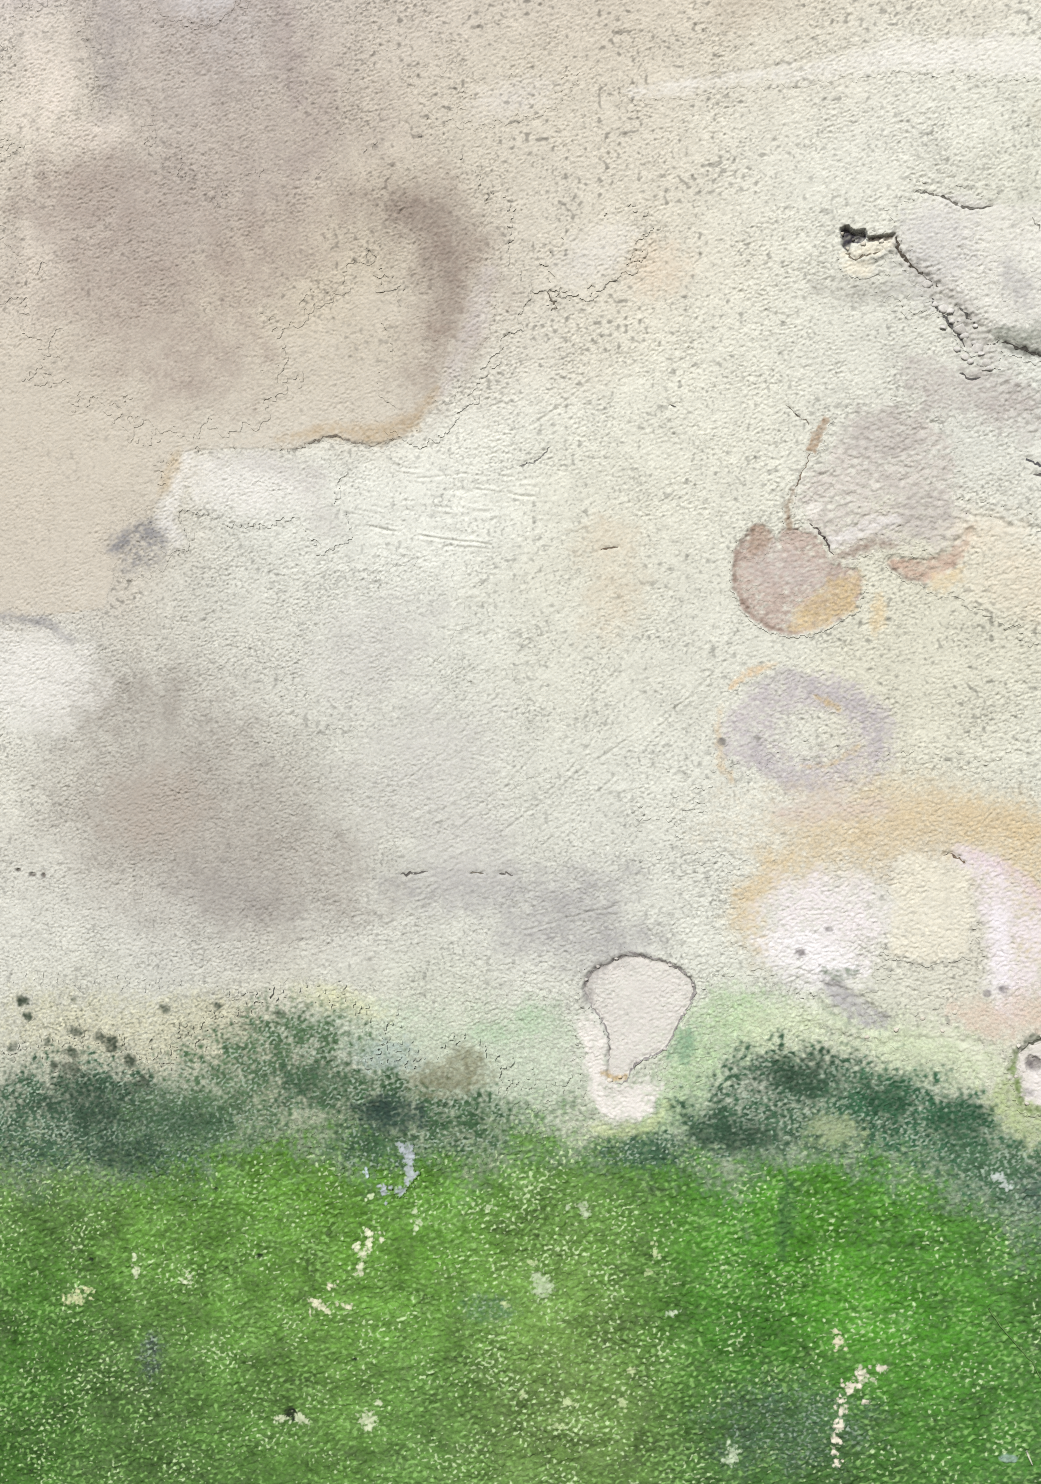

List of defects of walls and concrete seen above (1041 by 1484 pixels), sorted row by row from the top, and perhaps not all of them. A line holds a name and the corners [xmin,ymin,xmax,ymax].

flaking render [782,389,979,567]
flaking render [572,945,697,1144]
flaking render [1004,1032,1041,1120]
water stain [767,1172,801,1266]